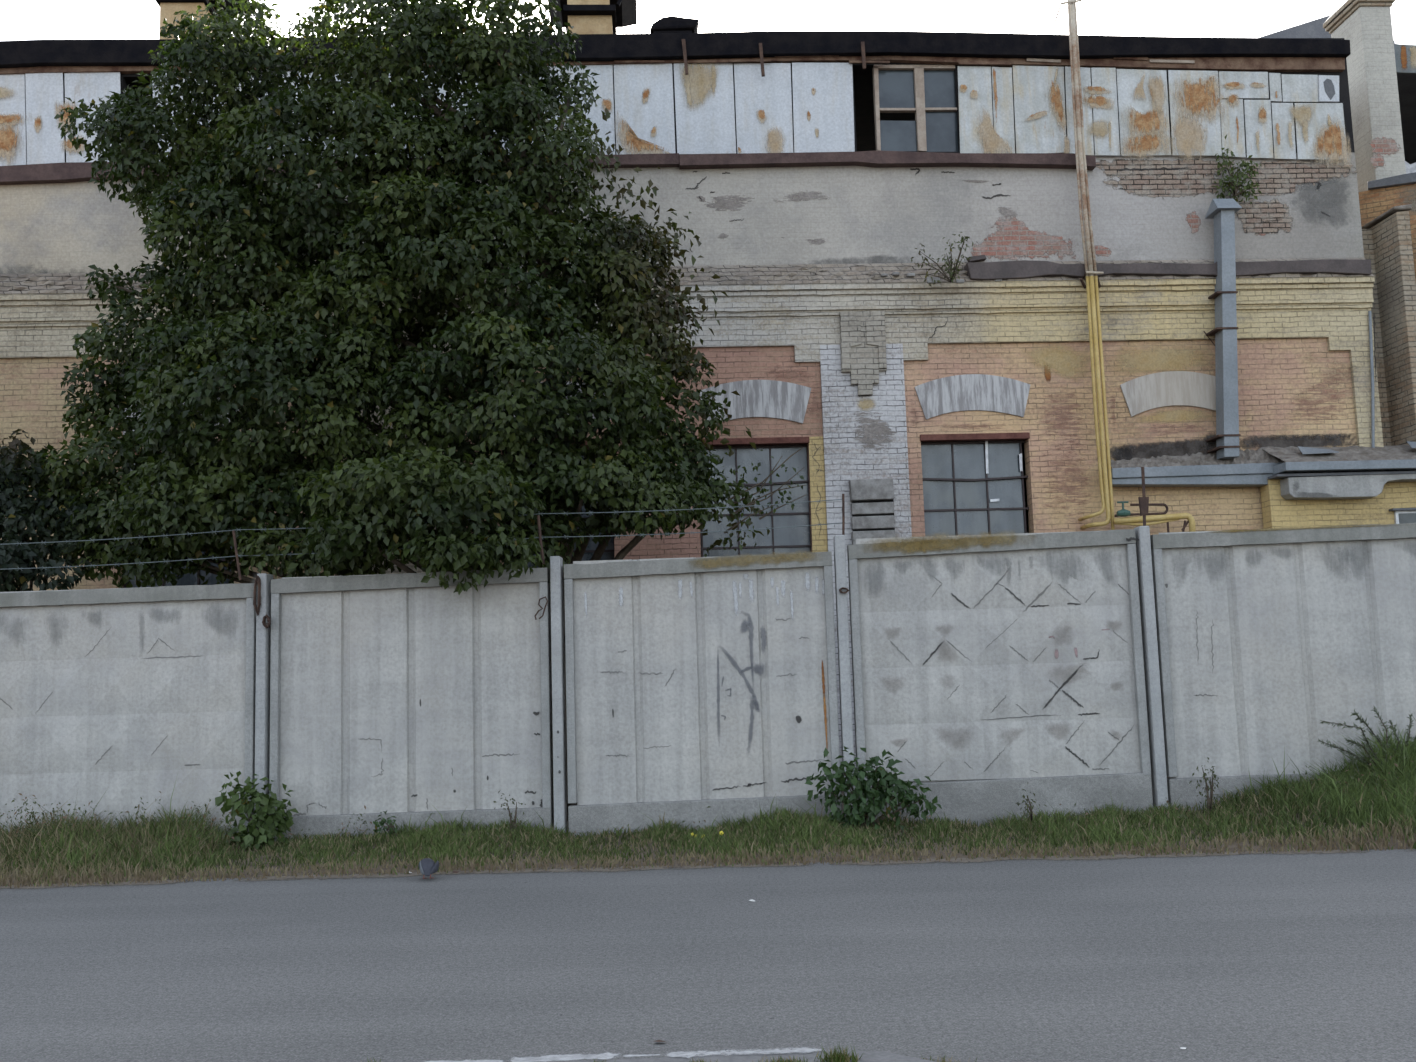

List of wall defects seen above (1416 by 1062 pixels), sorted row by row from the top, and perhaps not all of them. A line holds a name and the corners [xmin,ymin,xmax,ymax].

rust [0,87,84,161]
rust [602,100,669,154]
rust [683,65,716,105]
rust [758,110,783,153]
rust [960,69,1012,153]
rust [1027,69,1070,153]
rust [1084,75,1350,164]
spalling [1370,137,1401,168]
spalling [971,207,1076,261]
spalling [1096,159,1357,236]